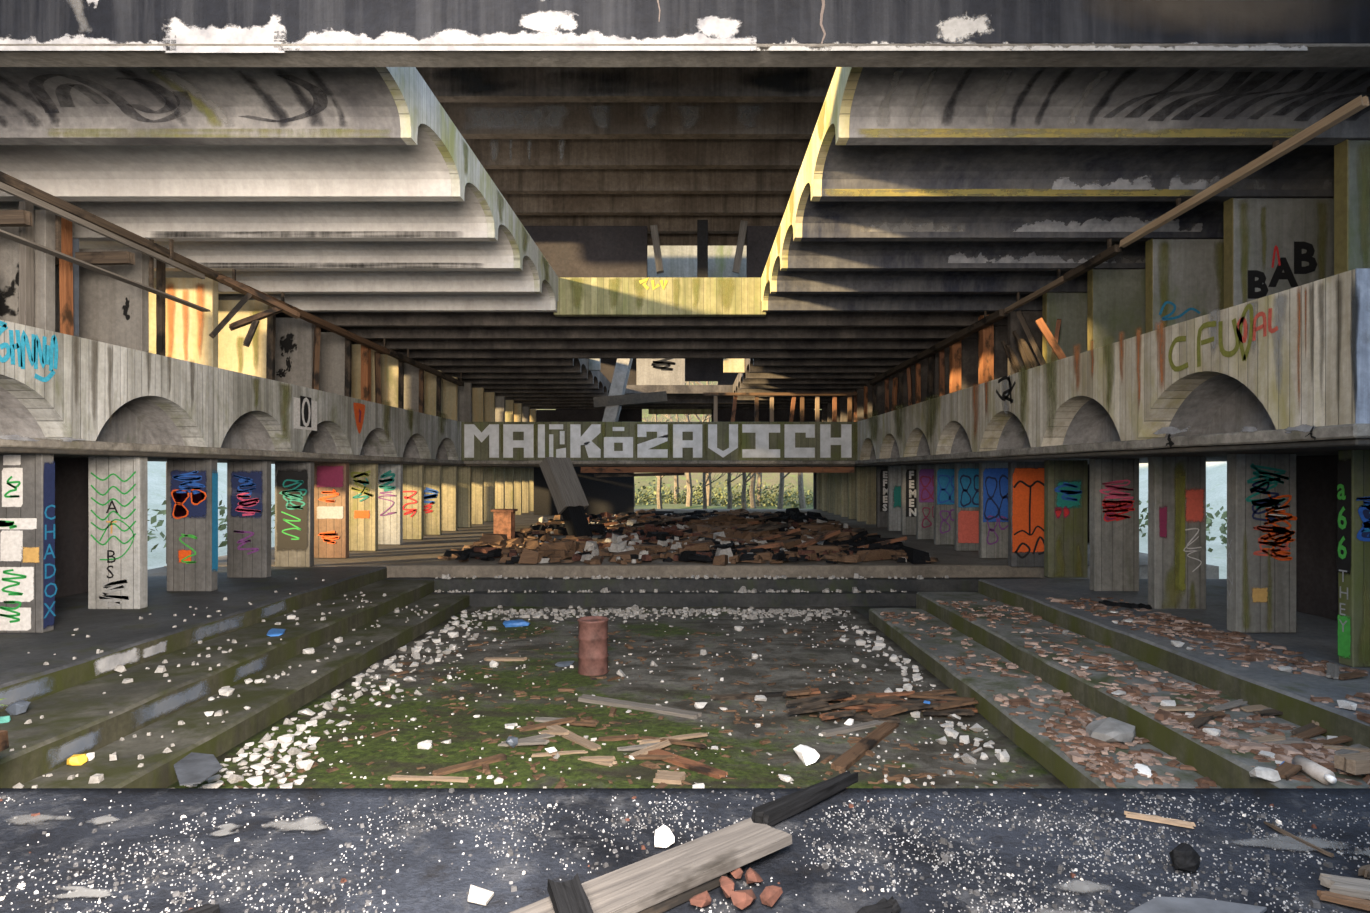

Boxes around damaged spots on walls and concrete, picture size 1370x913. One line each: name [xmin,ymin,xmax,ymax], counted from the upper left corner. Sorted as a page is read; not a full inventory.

peeling [0,0,1308,53]
crack [819,0,827,44]
peeling [0,76,58,124]
peeling [120,71,229,124]
peeling [241,73,287,125]
peeling [281,74,319,124]
peeling [1114,69,1370,121]
damp [1310,203,1359,401]
damp [75,338,111,396]